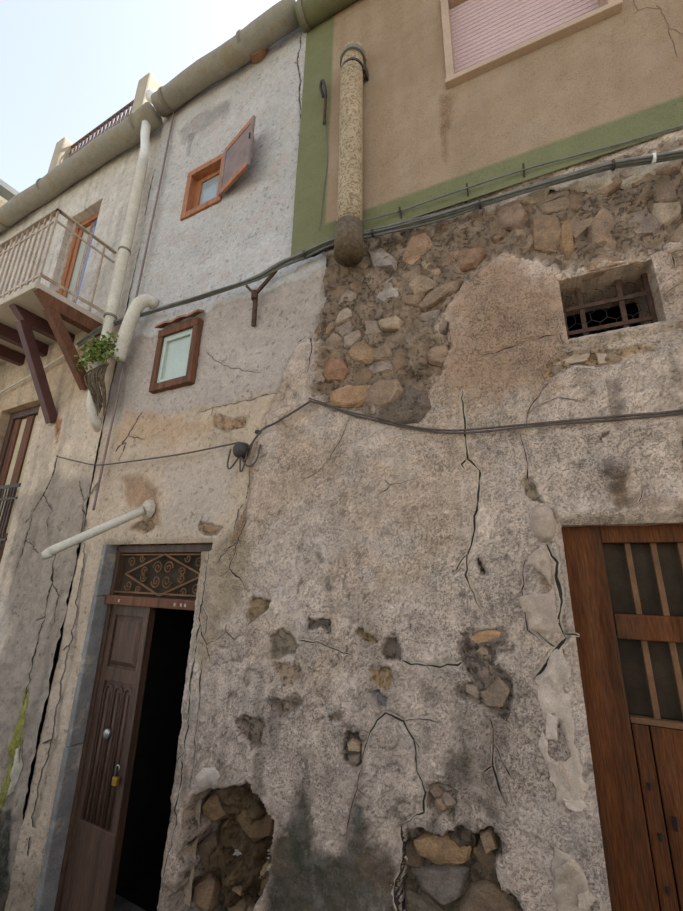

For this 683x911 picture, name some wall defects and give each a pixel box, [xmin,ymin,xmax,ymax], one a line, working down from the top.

spalling [307,140,683,419]
crack [455,388,484,614]
crack [519,383,583,484]
crack [16,455,98,857]
spalling [268,627,303,720]
crack [518,543,580,679]
flaking render [538,648,588,812]
damp [0,811,10,911]
spalling [169,783,275,911]
damp [267,797,396,911]
crack [344,711,438,911]
spalling [397,782,523,911]